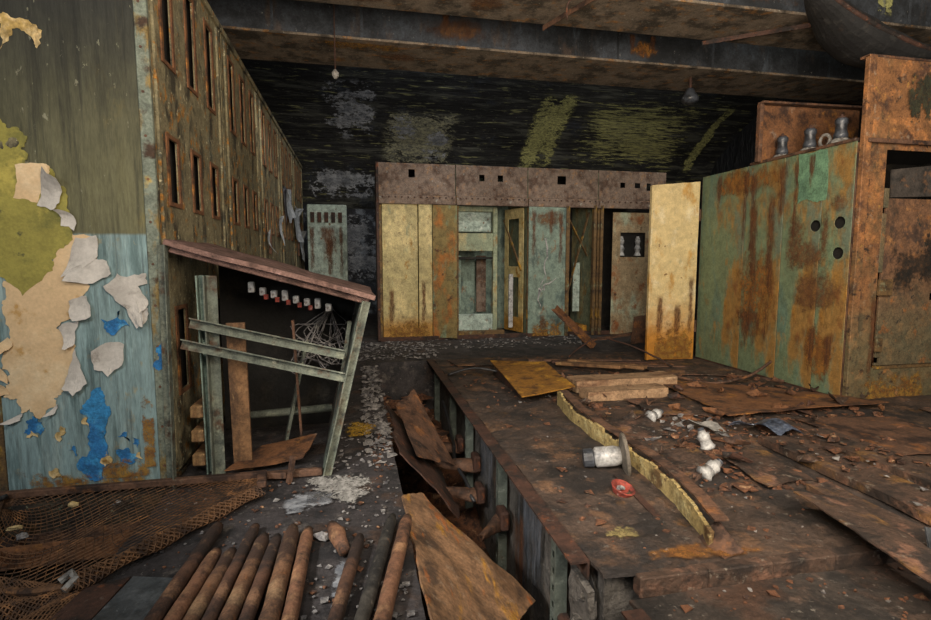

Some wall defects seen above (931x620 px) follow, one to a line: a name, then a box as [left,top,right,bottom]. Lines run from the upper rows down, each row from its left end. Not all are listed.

peeling [0,12,42,49]
efflorescence [323,81,376,138]
damp [384,112,456,164]
damp [520,95,580,168]
damp [568,102,714,171]
rust [532,211,563,261]
rust [718,165,844,342]
peeling [0,119,148,481]